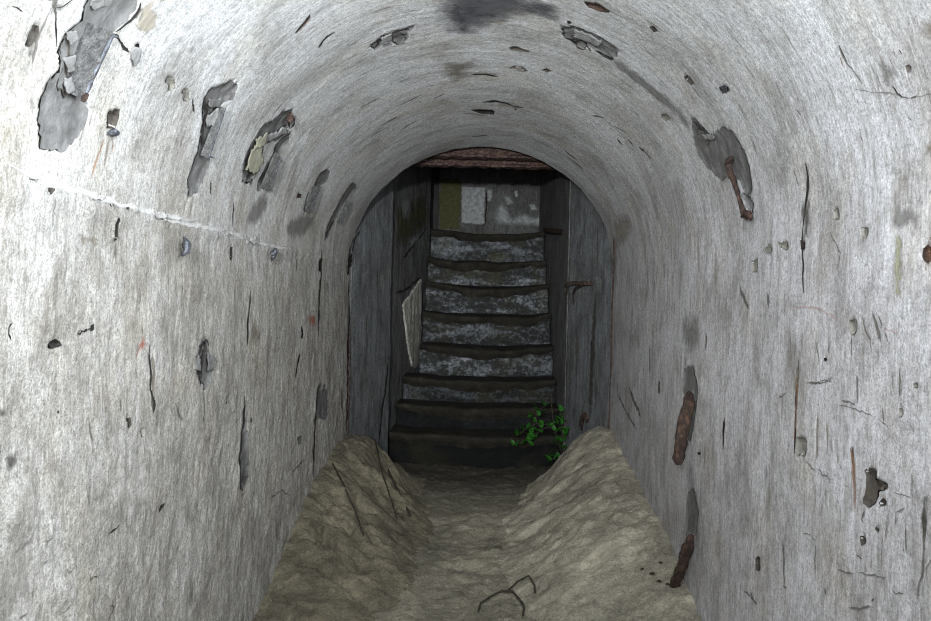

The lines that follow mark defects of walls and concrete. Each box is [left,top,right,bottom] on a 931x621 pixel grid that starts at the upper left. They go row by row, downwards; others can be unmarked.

spalling [370,26,413,50]
spalling [561,26,618,60]
spalling [38,0,137,152]
crack [850,86,929,99]
spalling [165,76,238,199]
spalling [242,109,296,191]
spalling [691,118,754,212]
rust [724,156,753,221]
rust [672,391,695,465]
spalling [861,468,888,522]
rust [641,534,694,588]